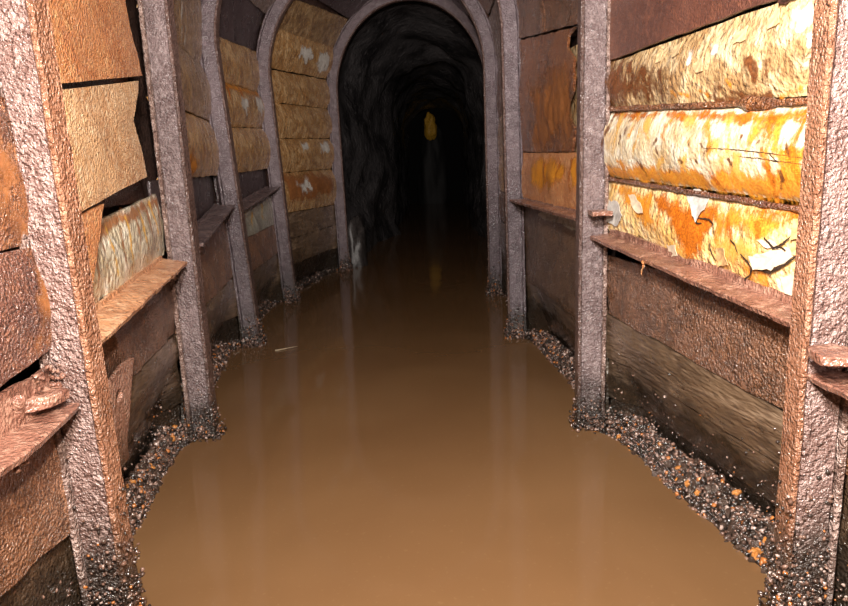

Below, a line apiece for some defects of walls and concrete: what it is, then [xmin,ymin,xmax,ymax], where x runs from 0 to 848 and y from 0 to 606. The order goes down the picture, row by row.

water stain [792,3,814,48]
water stain [299,45,330,73]
corrosion [601,55,807,287]
peeling [606,200,622,226]
peeling [628,194,643,213]
peeling [686,189,710,222]
crack [696,217,716,261]
crack [730,236,795,281]
peeling [748,219,798,270]
peeling [781,275,794,296]